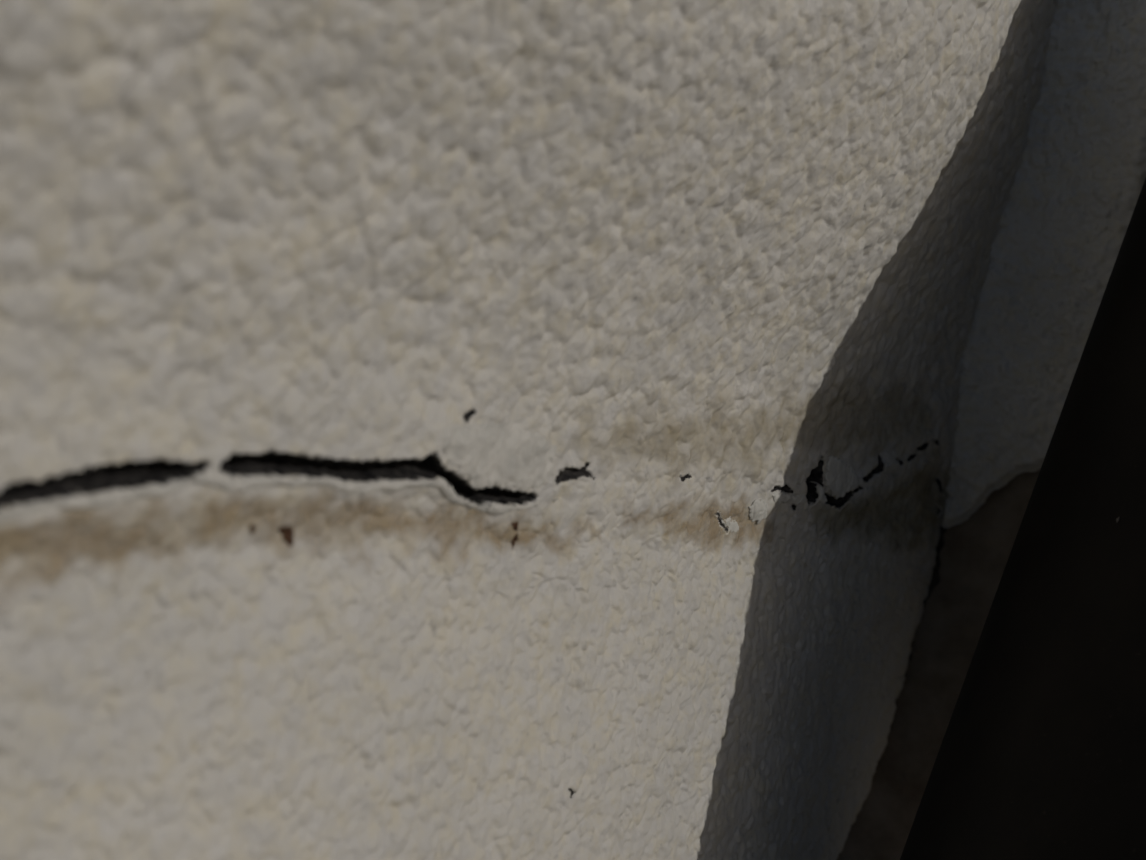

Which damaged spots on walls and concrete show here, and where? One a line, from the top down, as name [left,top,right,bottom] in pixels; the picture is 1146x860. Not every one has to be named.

crack [0,451,537,509]
crack [716,440,939,531]
crack [923,477,947,608]